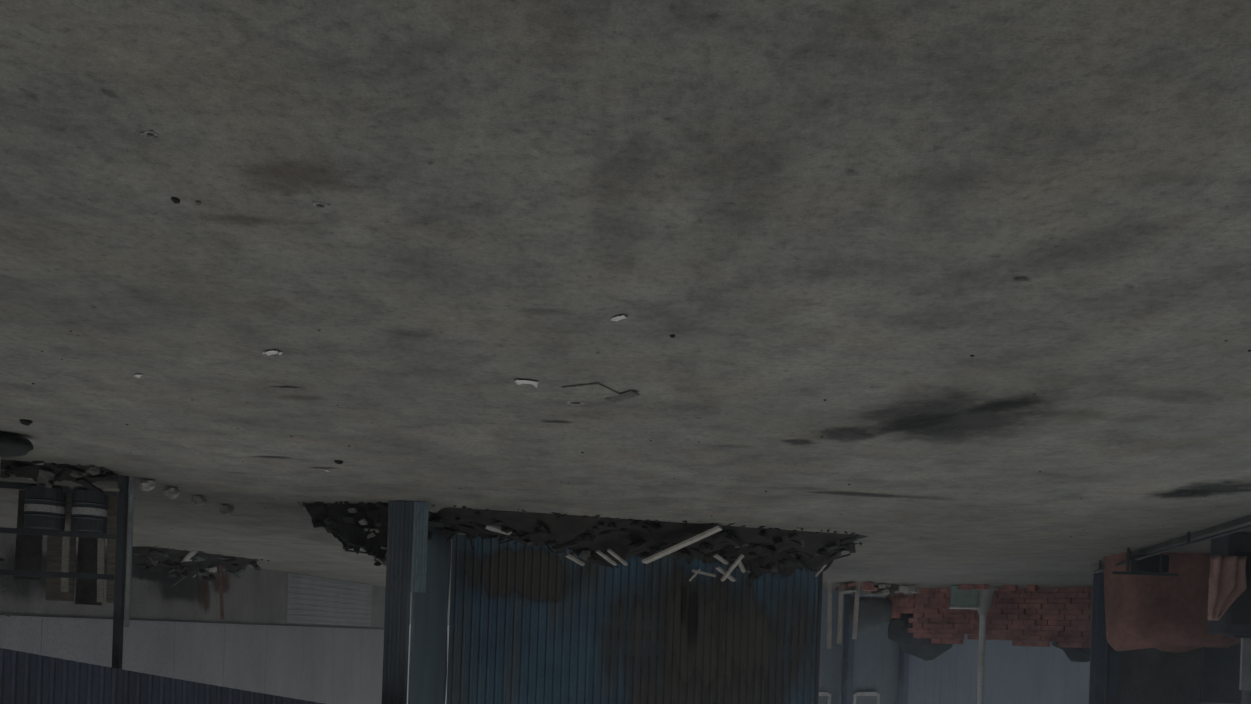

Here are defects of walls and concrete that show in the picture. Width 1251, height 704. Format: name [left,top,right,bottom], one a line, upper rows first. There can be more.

leakage [871,393,1037,438]
leakage [826,429,871,440]
leakage [1162,481,1251,498]